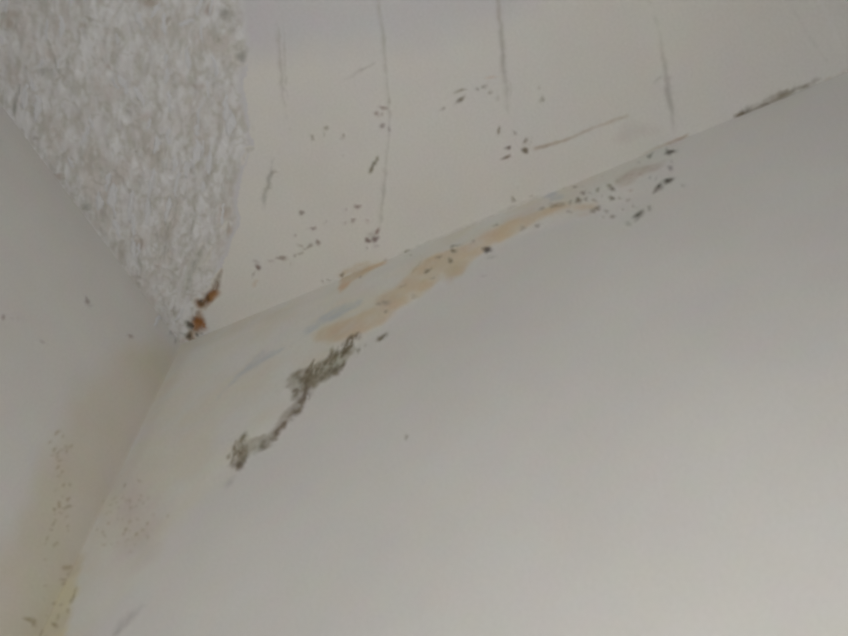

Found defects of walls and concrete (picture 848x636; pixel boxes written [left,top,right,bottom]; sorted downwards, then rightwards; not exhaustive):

crack [493,0,514,117]
leakage [205,0,848,333]
corrosion [187,267,226,341]
leakage [220,330,392,491]